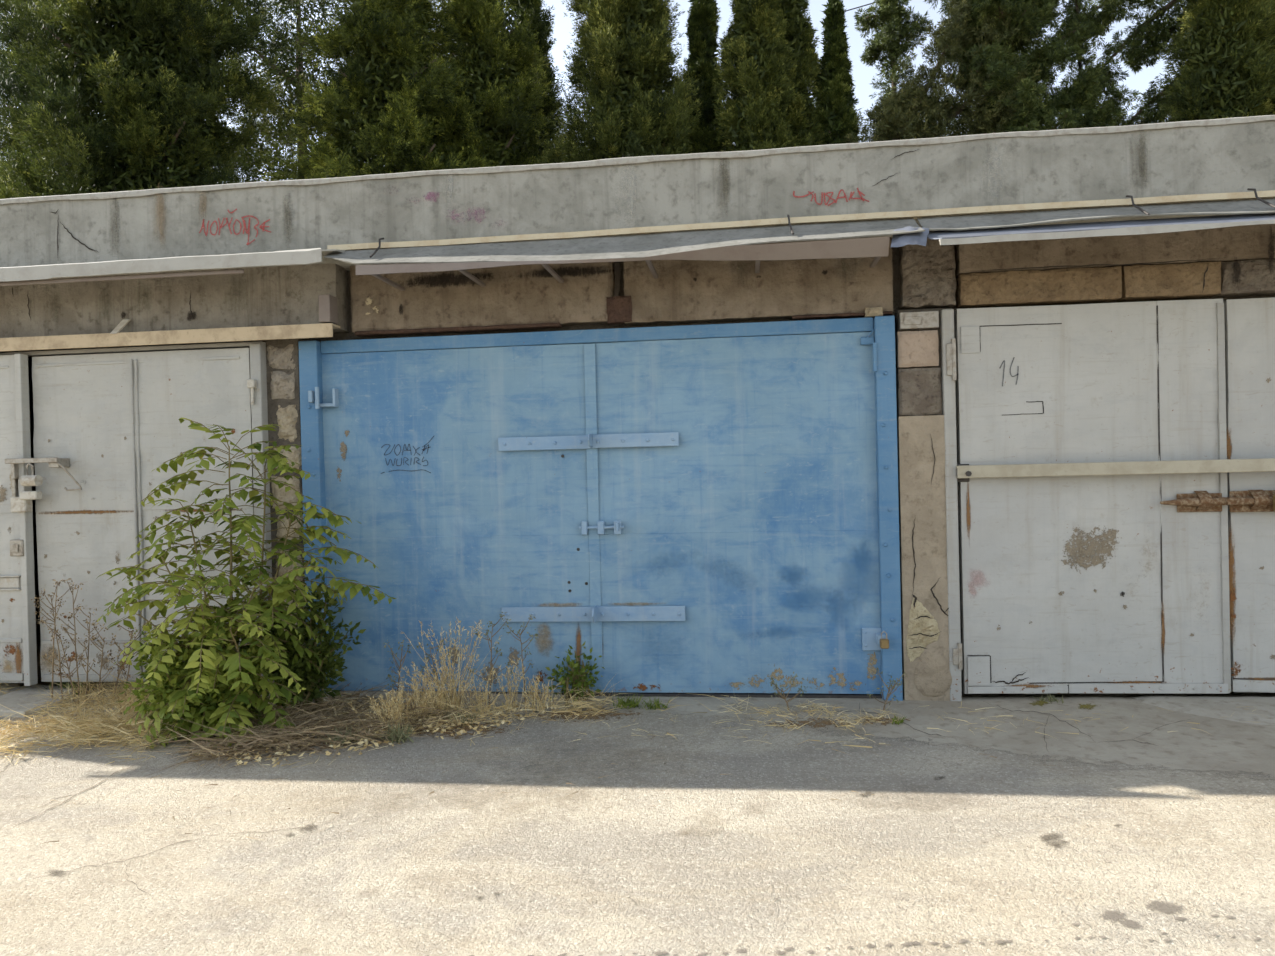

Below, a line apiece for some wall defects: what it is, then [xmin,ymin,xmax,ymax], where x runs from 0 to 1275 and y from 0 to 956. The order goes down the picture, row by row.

crack [51,209,97,251]
rust [0,644,22,673]